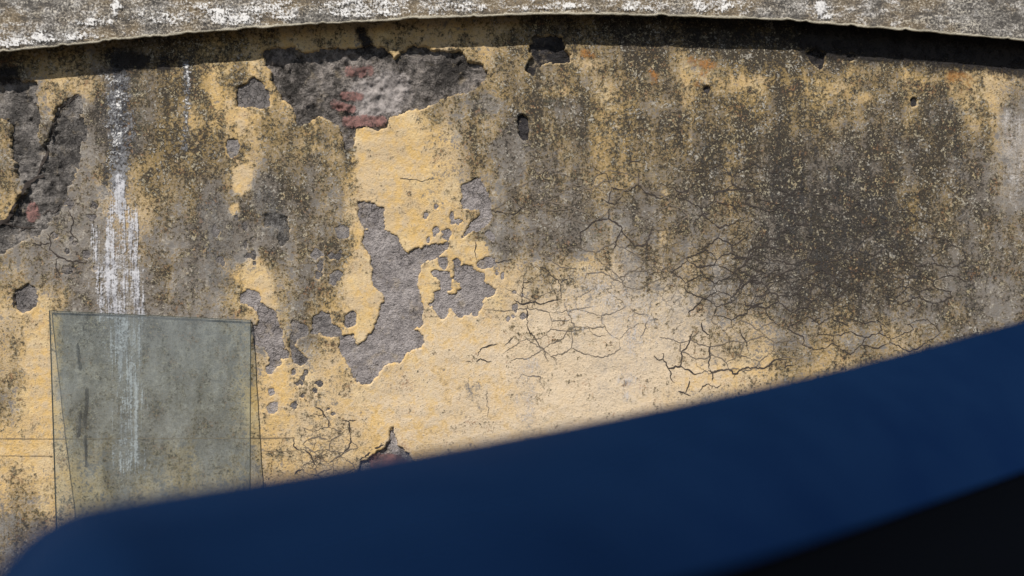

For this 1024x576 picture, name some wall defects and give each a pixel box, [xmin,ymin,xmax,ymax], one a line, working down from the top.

flaking render [237,45,487,149]
water stain [424,0,488,14]
flaking render [525,35,570,76]
water stain [506,0,1024,79]
flaking render [14,284,38,313]
flaking render [0,79,97,274]
water stain [91,47,191,473]
peeling [235,178,504,414]
crack [466,156,966,396]
water stain [593,109,926,311]
crack [0,407,384,474]
flaking render [361,427,409,463]